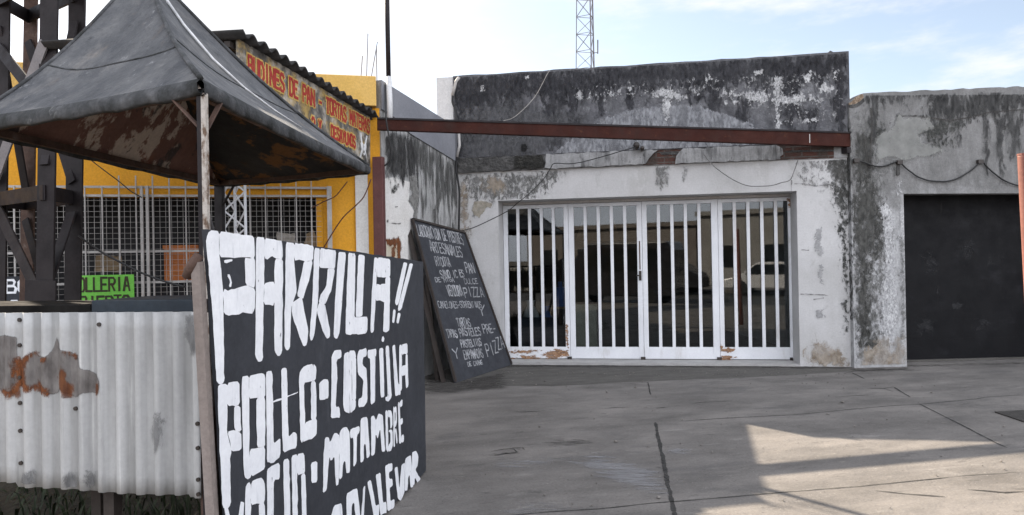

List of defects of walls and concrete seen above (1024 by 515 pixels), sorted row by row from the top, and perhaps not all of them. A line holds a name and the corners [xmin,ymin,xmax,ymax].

spalling [643,149,683,165]
spalling [776,145,834,160]
leakage [385,131,566,236]
peeling [472,200,492,218]
leakage [454,53,1024,367]
rust [511,324,570,359]
rust [0,335,99,398]